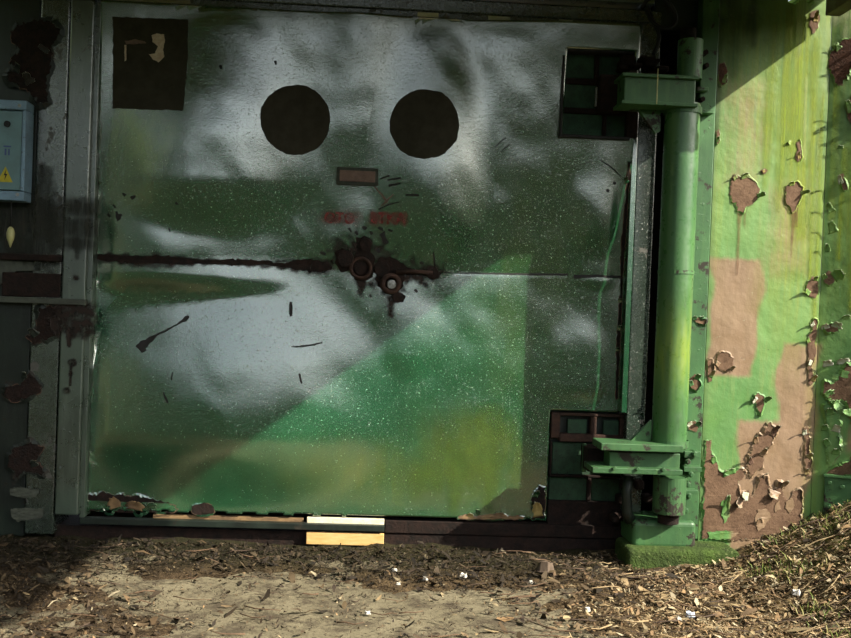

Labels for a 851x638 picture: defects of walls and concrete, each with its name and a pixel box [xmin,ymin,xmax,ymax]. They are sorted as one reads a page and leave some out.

peeling [1,16,65,111]
peeling [827,37,851,86]
peeling [729,168,768,215]
peeling [784,180,811,214]
corrosion [355,239,444,318]
corrosion [47,303,99,347]
corrosion [64,359,77,393]
peeling [689,350,736,393]
peeling [806,315,851,476]
peeling [4,437,49,522]
peeling [700,392,805,542]
peeling [802,425,814,477]